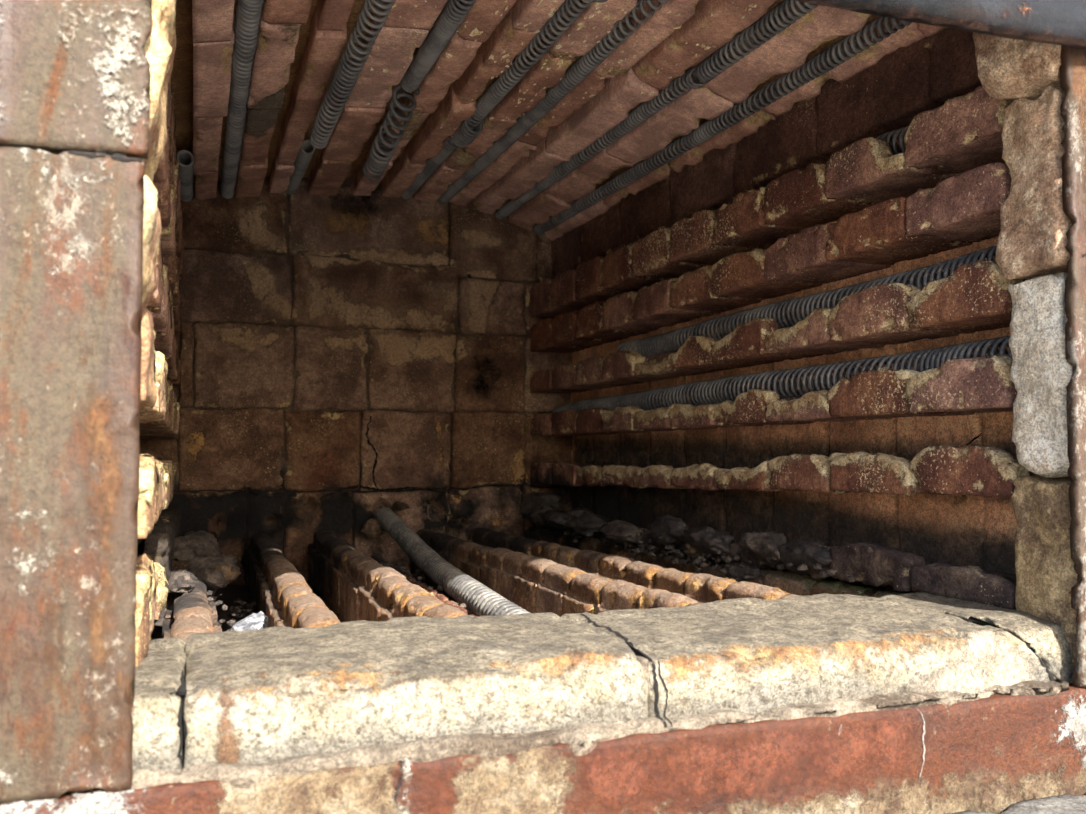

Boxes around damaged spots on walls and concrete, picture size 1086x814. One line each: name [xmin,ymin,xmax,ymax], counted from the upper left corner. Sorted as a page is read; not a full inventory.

corrosion [799,0,1086,150]
corrosion [84,397,122,551]
crack [320,416,450,499]
crack [169,670,192,765]
crack [580,613,672,727]
corrosion [583,709,917,809]
crack [962,616,1056,682]